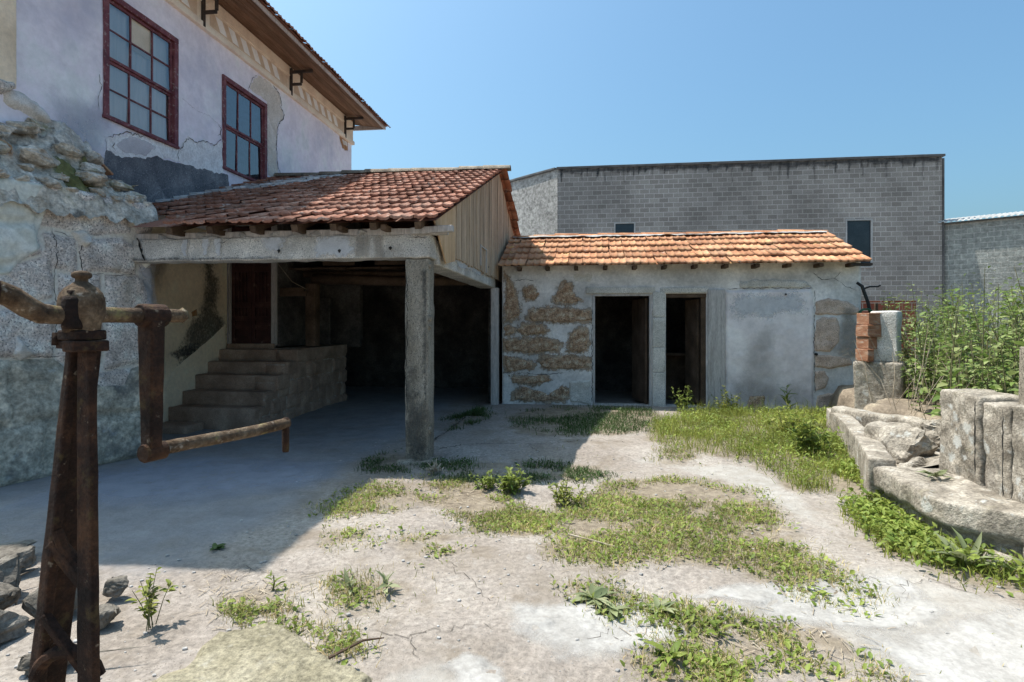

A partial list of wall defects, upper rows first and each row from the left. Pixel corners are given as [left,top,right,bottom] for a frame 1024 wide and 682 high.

flaking render [104,131,229,202]
flaking render [248,76,284,177]